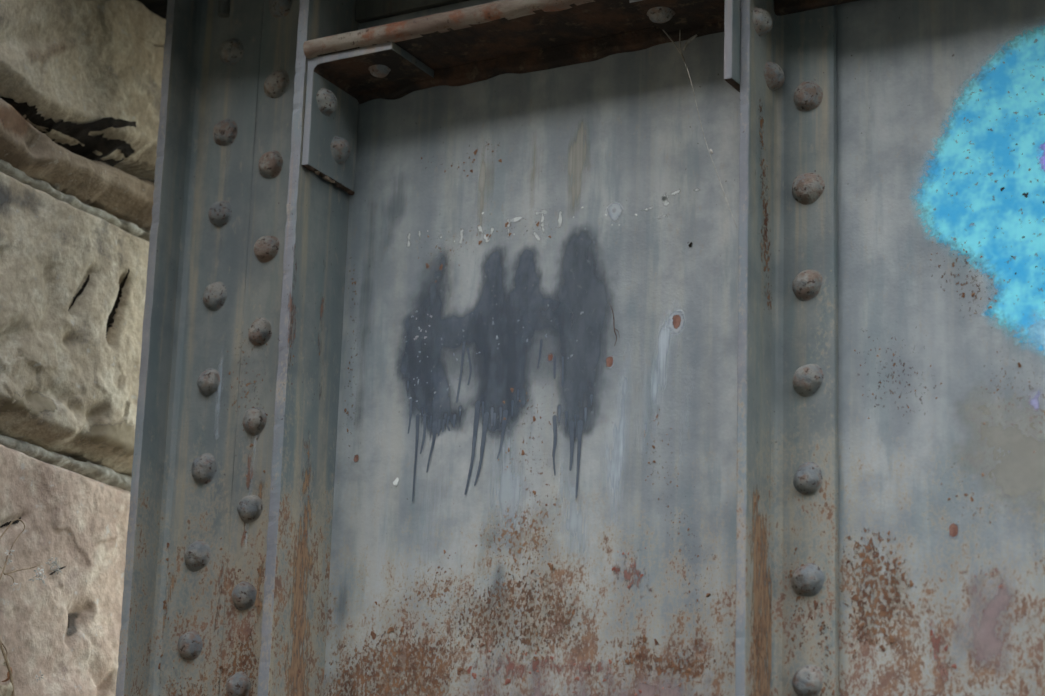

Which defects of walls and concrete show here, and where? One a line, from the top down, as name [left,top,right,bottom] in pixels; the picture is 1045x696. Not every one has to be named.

corrosion [158,565,263,696]
corrosion [285,443,313,696]
corrosion [324,388,717,696]
corrosion [790,527,921,696]
corrosion [929,621,957,682]
corrosion [941,458,993,538]